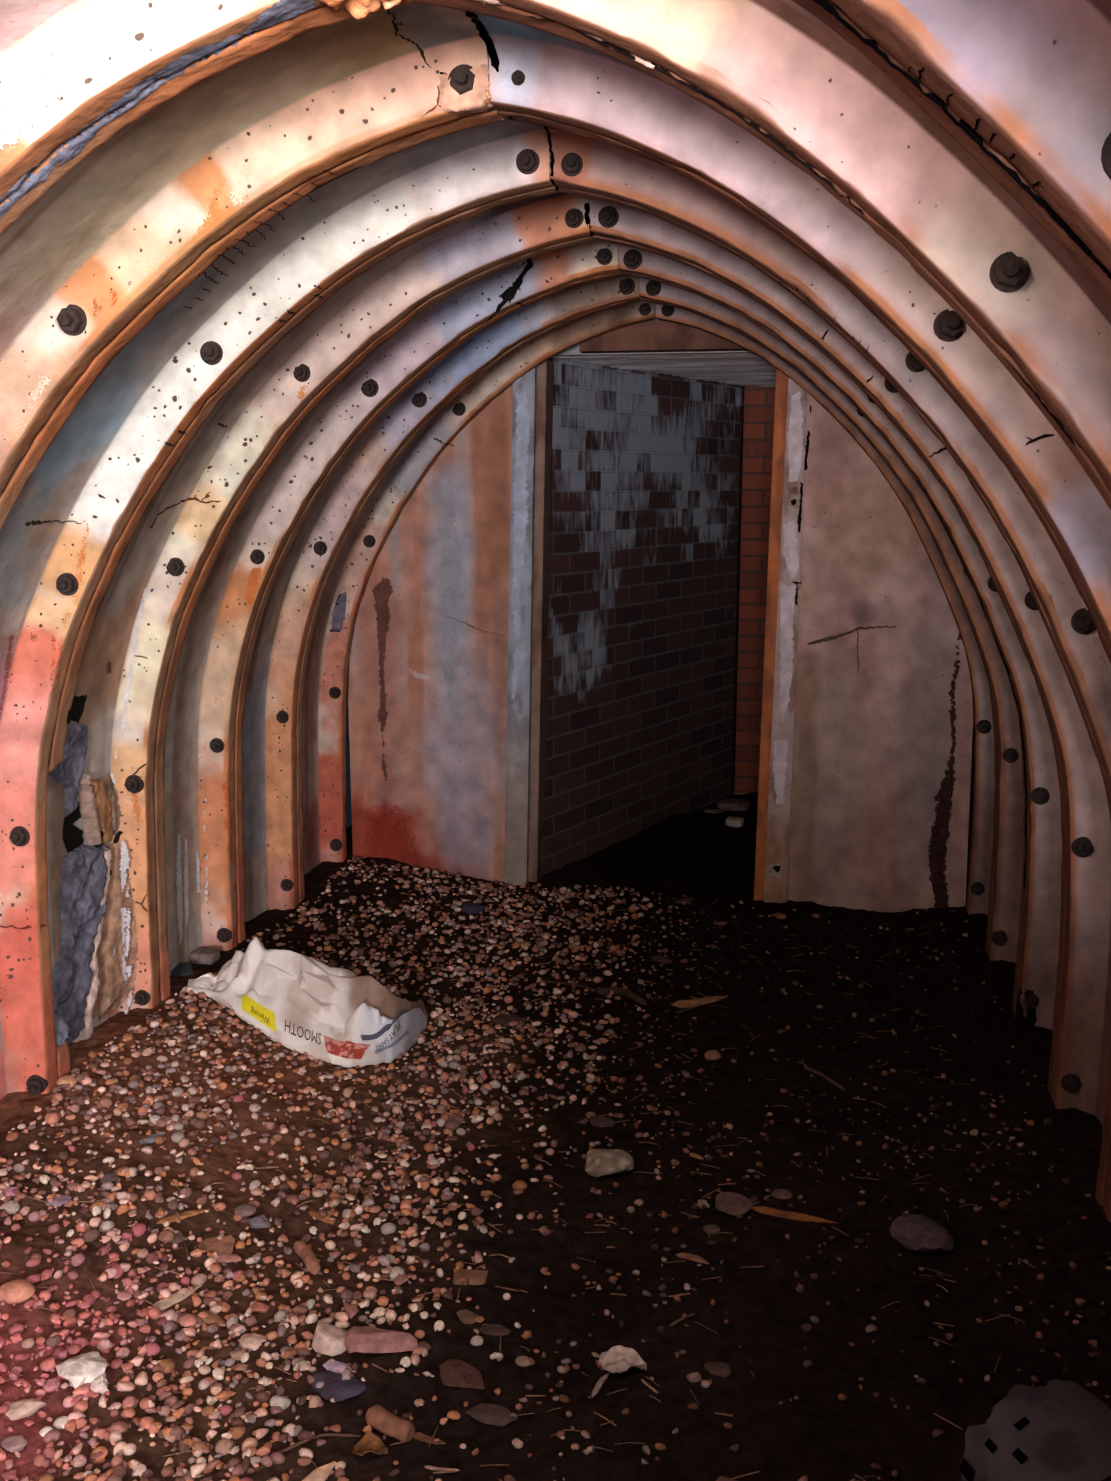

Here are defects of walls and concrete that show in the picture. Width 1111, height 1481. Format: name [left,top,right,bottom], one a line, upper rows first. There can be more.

crack [462,10,500,75]
spalling [0,0,404,219]
crack [487,257,534,322]
peeling [5,367,51,445]
crack [807,625,896,674]
crack [915,447,1027,891]
spalling [49,694,123,1045]
corrosion [358,800,433,870]